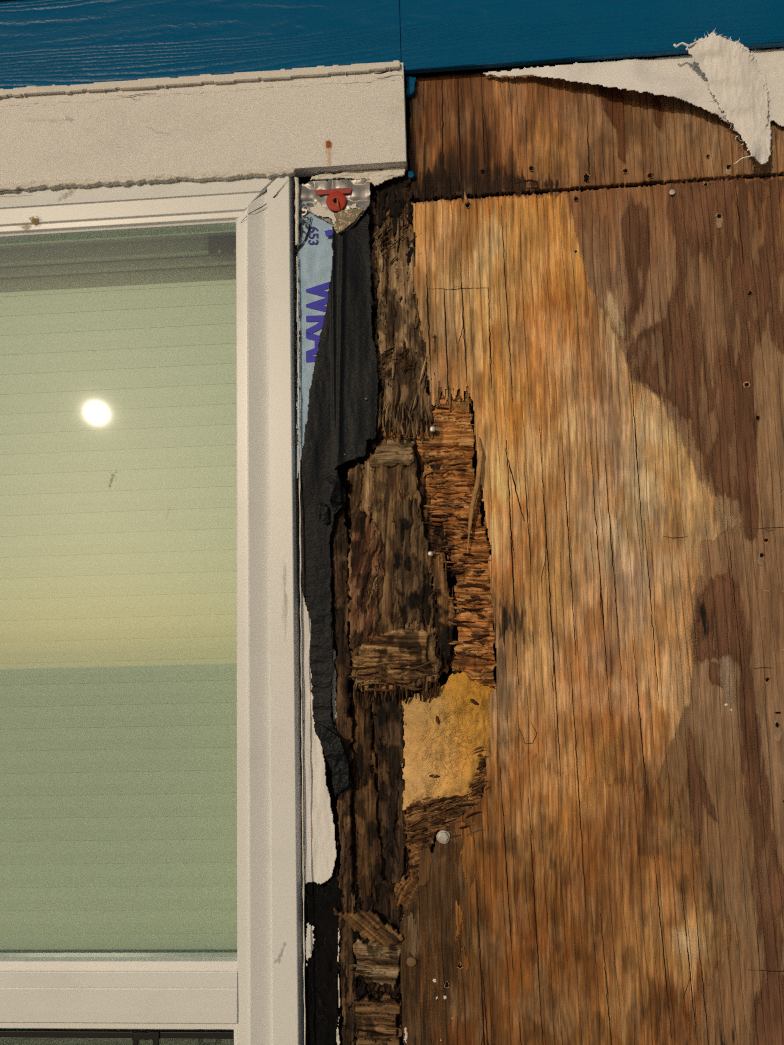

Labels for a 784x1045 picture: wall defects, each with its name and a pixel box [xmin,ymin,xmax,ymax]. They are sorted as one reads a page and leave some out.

peeling [370,440,415,468]
peeling [343,508,440,706]
damp [399,167,784,1045]
peeling [394,871,420,913]